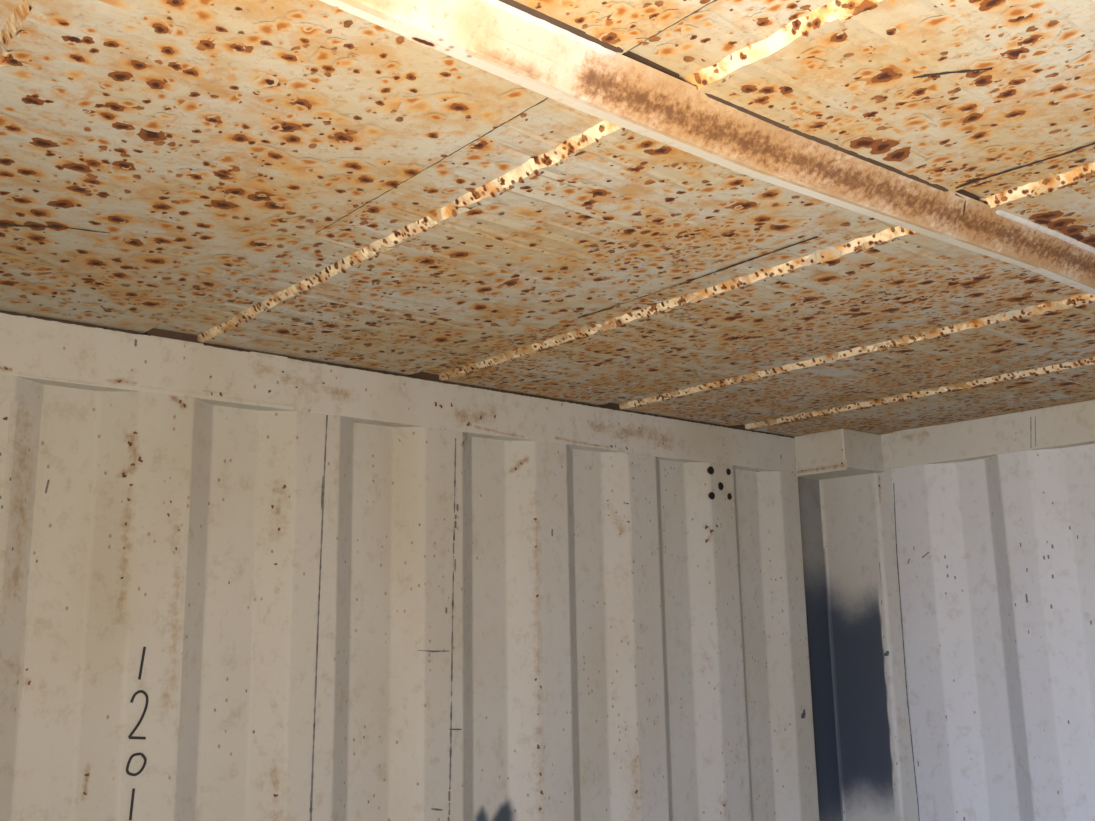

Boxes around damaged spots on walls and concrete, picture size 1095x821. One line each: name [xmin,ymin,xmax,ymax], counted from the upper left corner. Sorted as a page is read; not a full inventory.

rust [0,0,1095,459]